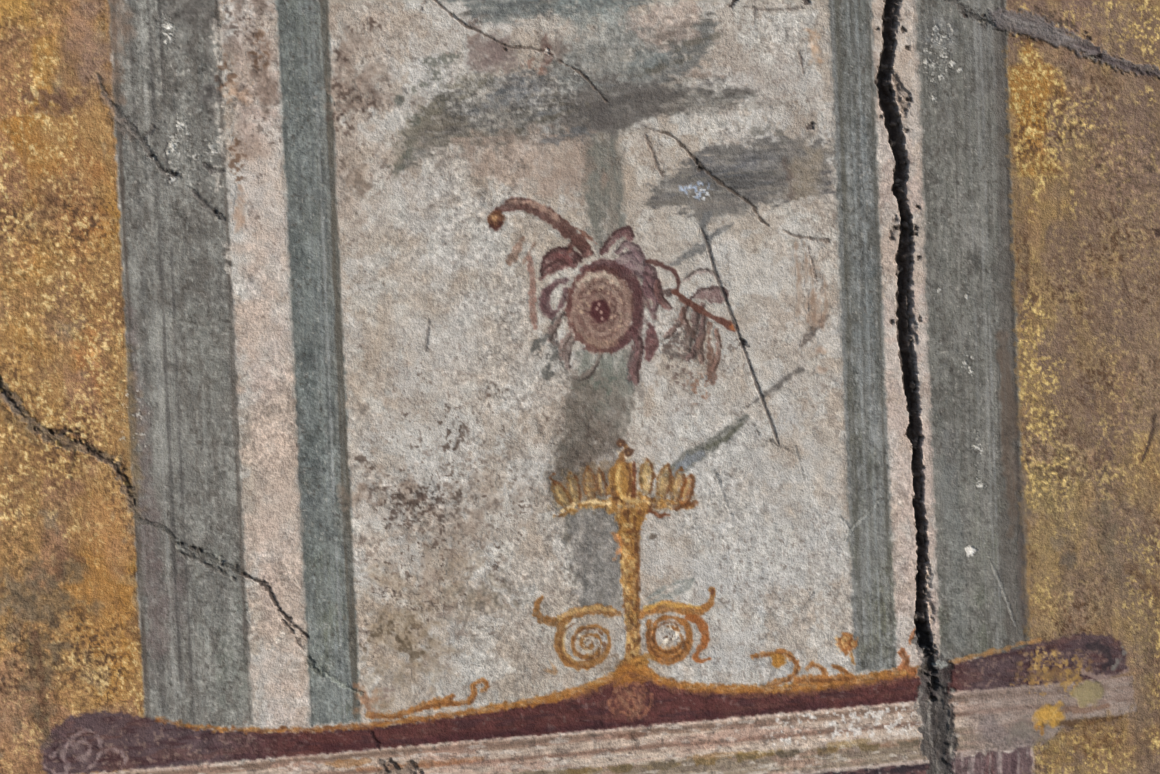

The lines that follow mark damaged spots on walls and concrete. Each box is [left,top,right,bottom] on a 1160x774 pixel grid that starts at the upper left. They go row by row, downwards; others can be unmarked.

crack [419,0,608,104]
crack [942,0,1160,81]
crack [643,126,831,284]
crack [874,0,953,774]
crack [0,375,365,698]
spalling [369,729,424,774]